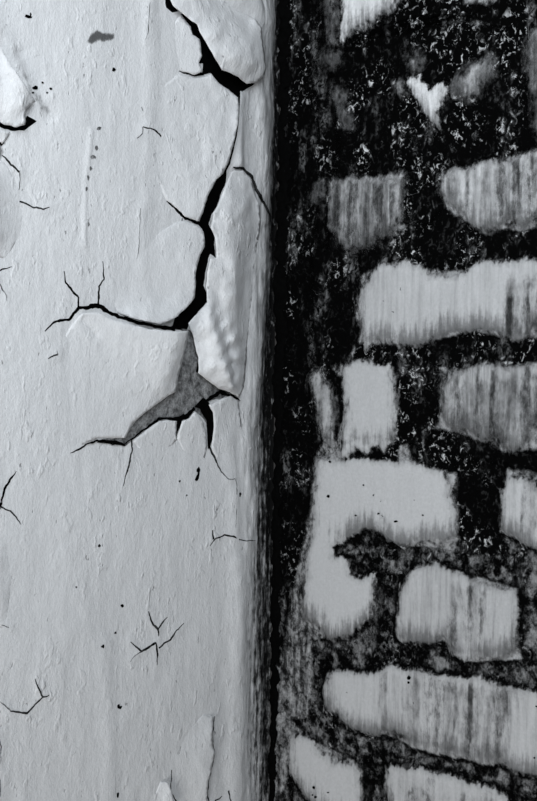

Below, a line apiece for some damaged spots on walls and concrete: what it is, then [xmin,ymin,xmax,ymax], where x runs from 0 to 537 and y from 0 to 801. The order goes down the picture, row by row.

peeling [0,46,52,258]
peeling [45,0,274,458]
crack [123,440,133,486]
peeling [0,472,21,524]
crack [130,611,184,665]